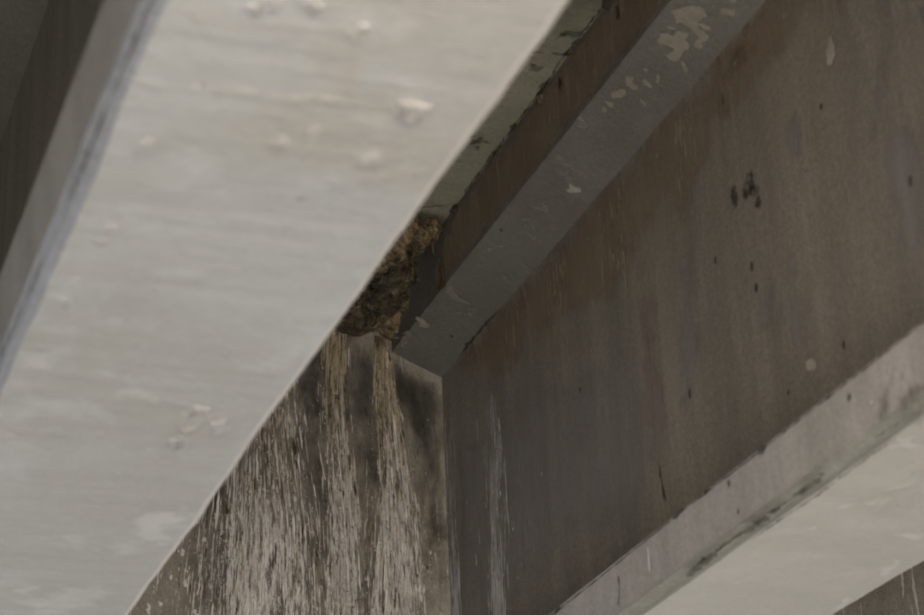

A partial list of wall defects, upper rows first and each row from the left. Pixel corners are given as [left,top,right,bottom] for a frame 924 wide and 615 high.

peeling [657,5,711,72]
leakage [125,331,461,615]